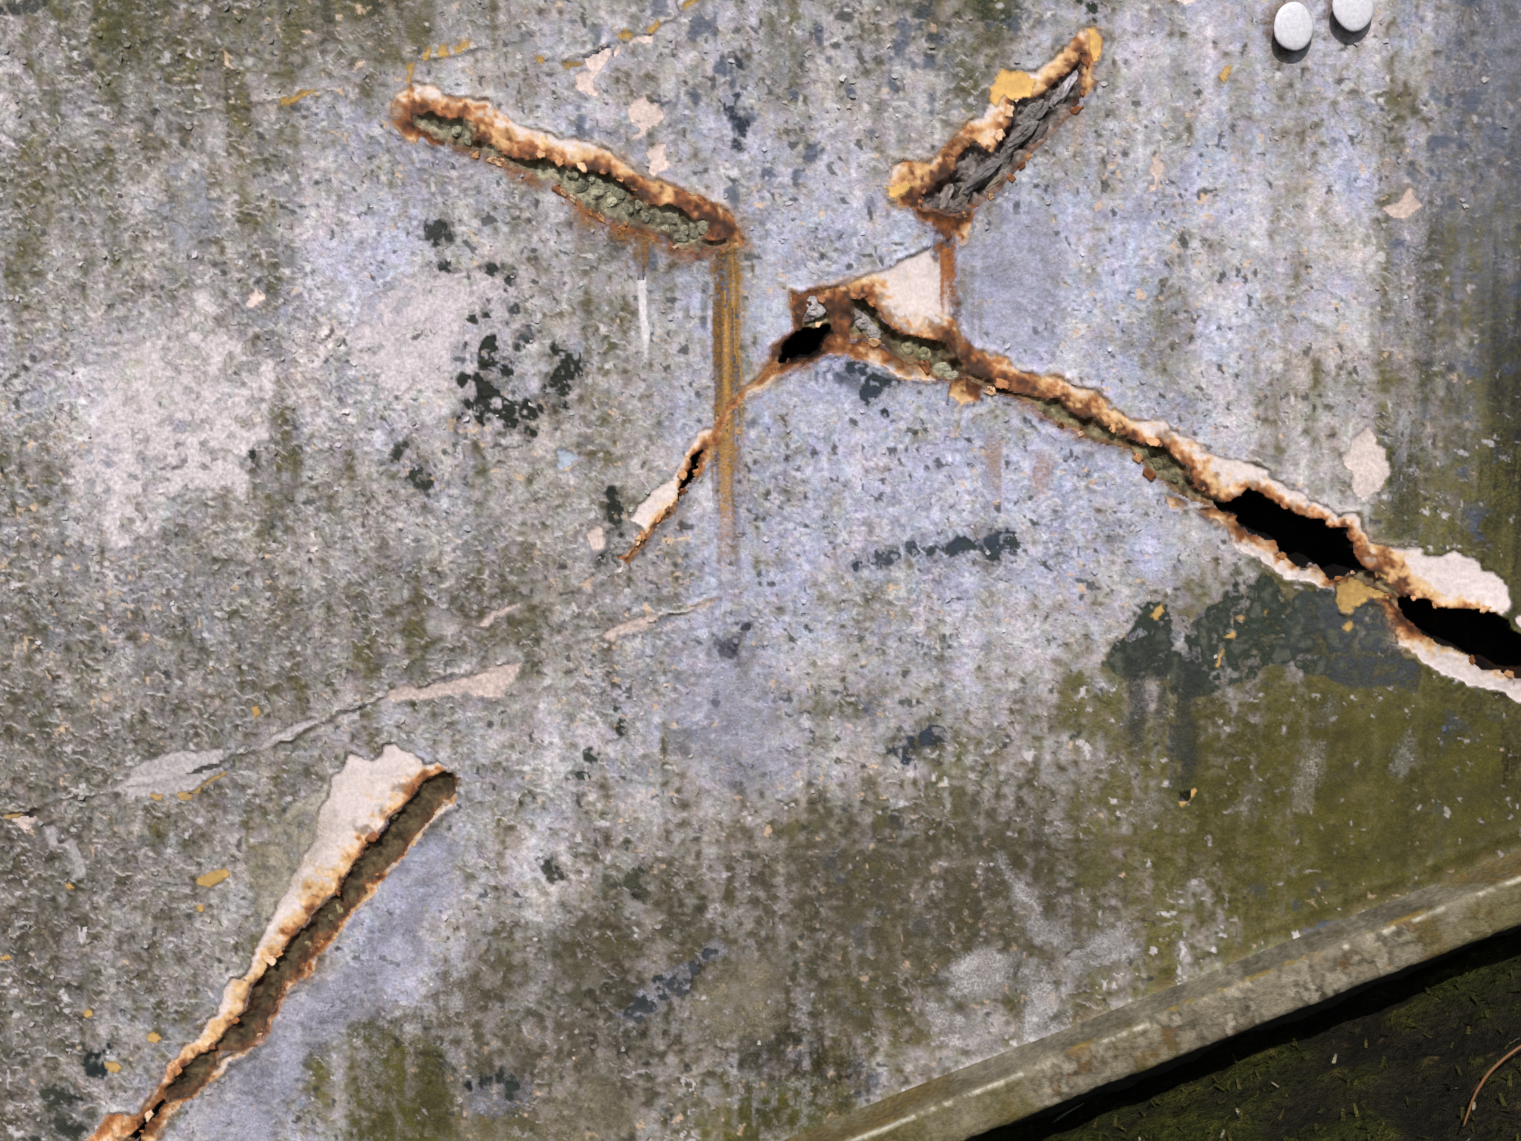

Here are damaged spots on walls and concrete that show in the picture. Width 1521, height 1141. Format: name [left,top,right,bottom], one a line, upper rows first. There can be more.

peeling [688,9,1021,199]
corrosion [709,250,745,542]
crack [617,27,1521,703]
peeling [0,0,703,1141]
peeling [713,571,1079,750]
peeling [913,464,1098,575]
peeling [1214,615,1247,667]
leakage [1102,574,1421,779]
leakage [1293,743,1325,811]